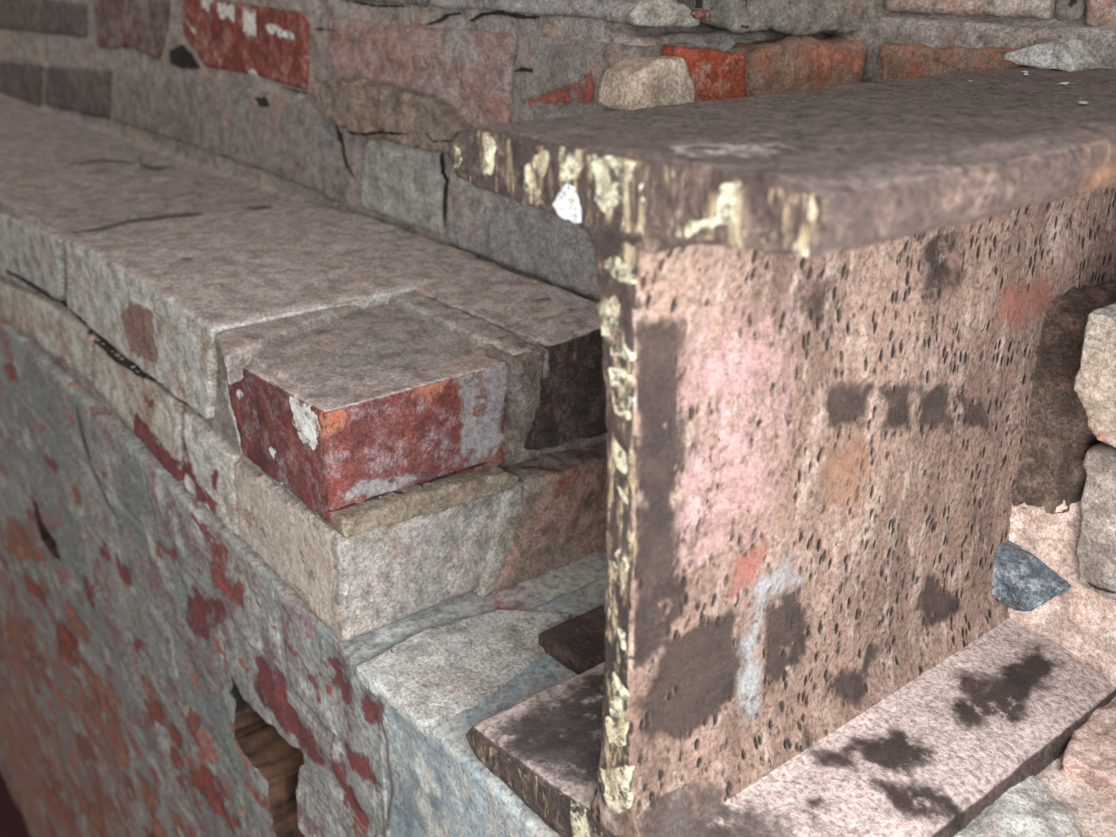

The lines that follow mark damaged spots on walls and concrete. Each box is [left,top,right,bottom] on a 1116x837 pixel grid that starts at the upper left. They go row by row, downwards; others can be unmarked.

crack [336,124,452,227]
crack [6,271,204,417]
peeling [345,473,417,502]
peeling [410,364,520,466]
peeling [454,131,828,813]
corrosion [493,228,810,802]
corrosion [827,381,988,500]
corrosion [952,646,1057,728]
peeling [253,655,384,827]
peeling [472,736,603,837]
corrosion [638,787,786,837]
corrosion [805,731,964,829]